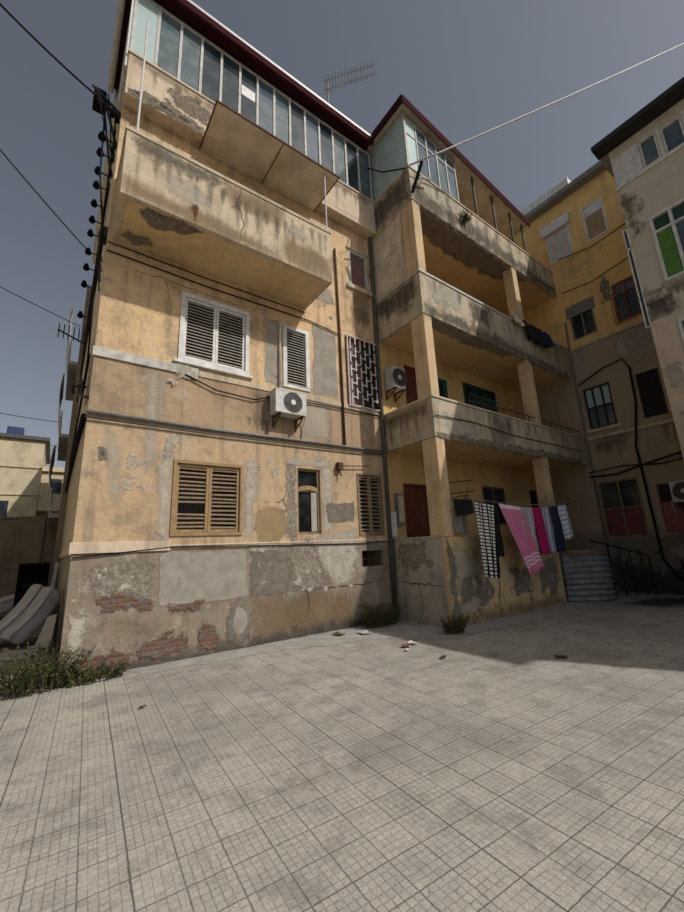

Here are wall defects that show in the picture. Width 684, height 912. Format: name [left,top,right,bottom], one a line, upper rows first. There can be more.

spalling [128,87,211,135]
spalling [138,208,203,235]
damp [126,177,268,251]
damp [136,136,281,222]
damp [286,241,330,275]
spalling [418,179,526,282]
damp [353,281,415,323]
damp [428,301,569,377]
spalling [84,559,155,612]
flaking render [61,585,222,673]
crack [290,580,442,613]
peeling [446,538,495,620]